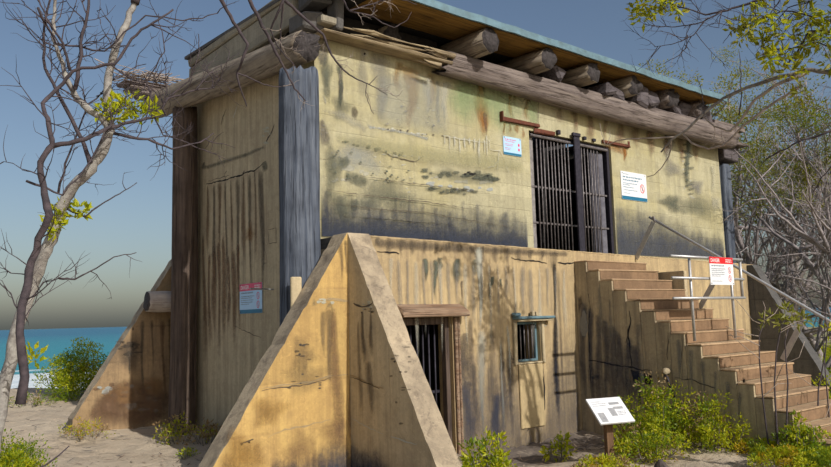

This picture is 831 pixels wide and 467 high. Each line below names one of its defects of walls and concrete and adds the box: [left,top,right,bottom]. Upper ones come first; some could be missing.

damp [322,67,343,112]
corrosion [477,85,487,131]
crack [207,161,266,184]
peeling [330,140,499,195]
damp [321,211,566,316]
crack [588,294,715,388]
crack [262,374,383,391]